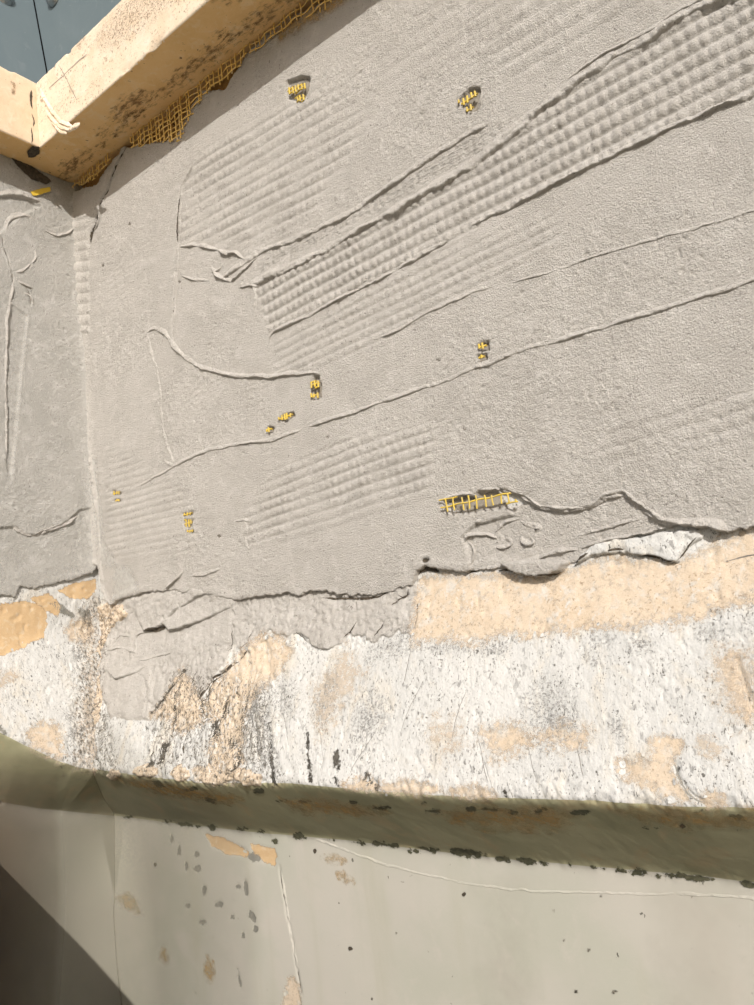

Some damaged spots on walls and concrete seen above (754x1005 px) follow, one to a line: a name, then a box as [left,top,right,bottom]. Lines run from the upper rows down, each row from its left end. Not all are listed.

peeling [409,487,754,649]
peeling [0,579,96,656]
peeling [25,719,67,765]
spalling [63,602,165,788]
peeling [149,630,295,804]
peeling [480,720,596,763]
peeling [712,650,754,722]
peeling [339,773,519,816]
peeling [614,733,746,830]